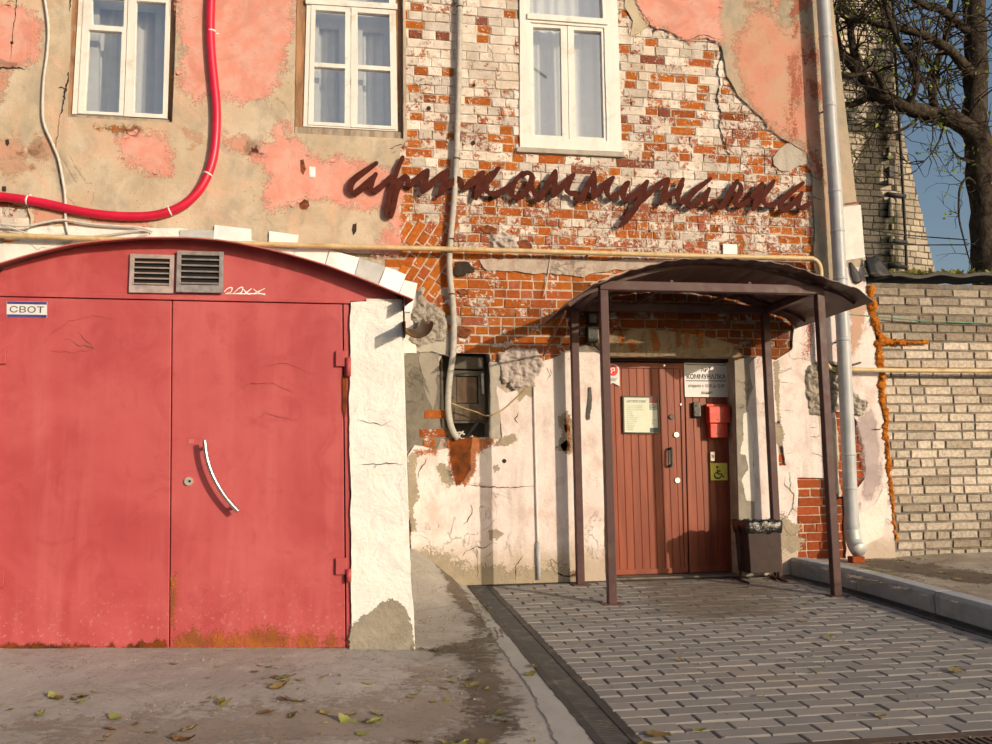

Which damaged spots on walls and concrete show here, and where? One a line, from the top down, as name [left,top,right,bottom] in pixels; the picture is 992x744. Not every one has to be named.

crack [0,0,23,69]
peeling [0,1,46,103]
peeling [174,0,296,108]
crack [689,34,731,170]
peeling [0,132,53,176]
spalling [223,0,824,466]
peeling [407,409,447,532]
peeling [740,411,756,502]
spalling [780,411,845,559]
spalling [854,419,865,487]
rust [107,573,345,648]
spalling [348,598,415,650]